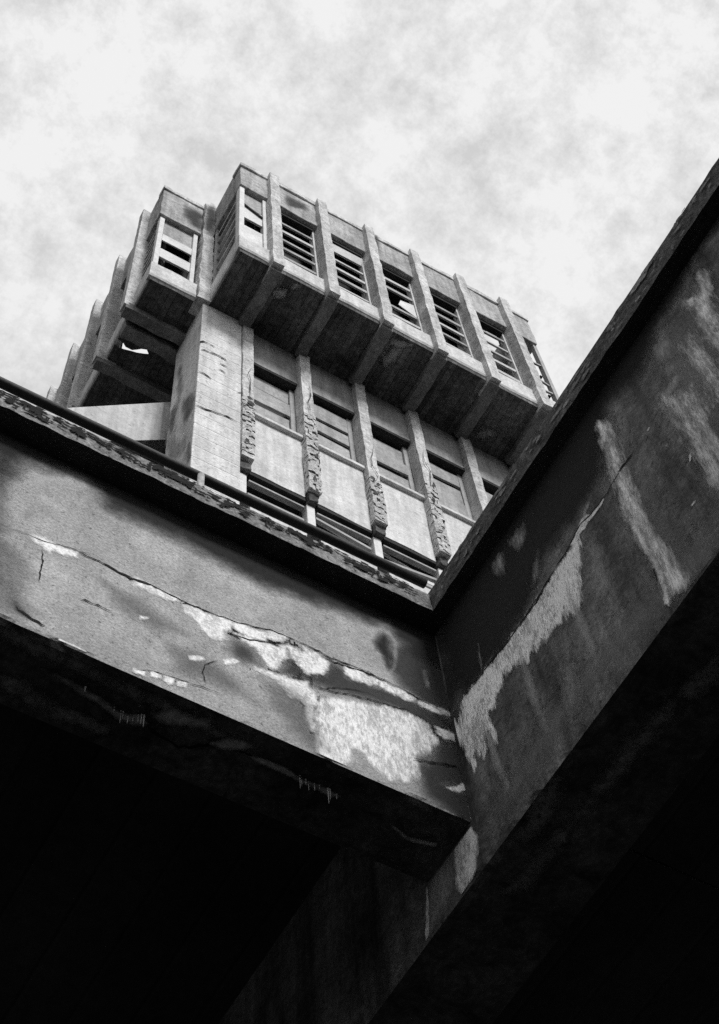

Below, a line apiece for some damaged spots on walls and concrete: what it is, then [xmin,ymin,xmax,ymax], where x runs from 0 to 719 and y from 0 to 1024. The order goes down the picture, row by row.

damp [663,274,719,482]
crack [4,525,452,724]
damp [0,268,708,939]